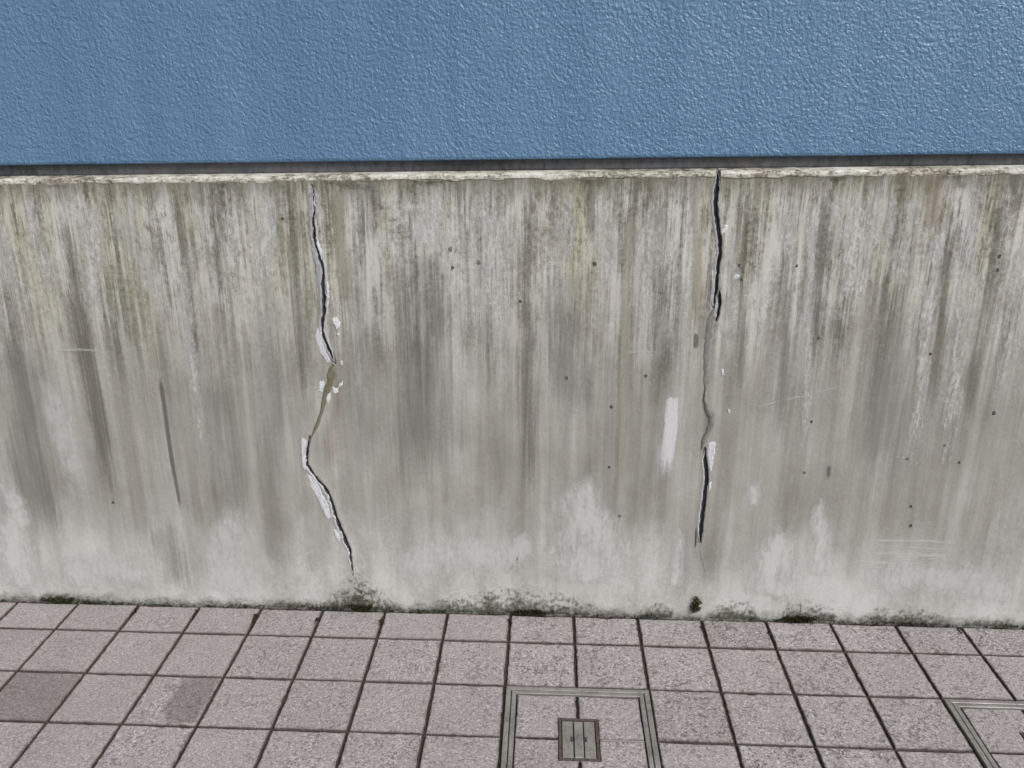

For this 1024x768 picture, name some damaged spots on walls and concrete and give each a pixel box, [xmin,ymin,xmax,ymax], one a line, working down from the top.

damp [62,209,110,463]
crack [301,182,354,575]
damp [389,188,457,248]
damp [470,200,517,329]
damp [594,192,666,464]
crack [694,171,740,573]
damp [781,214,814,439]
damp [828,195,920,297]
damp [910,215,978,433]
damp [0,479,39,588]
damp [405,535,531,576]
damp [550,480,631,583]